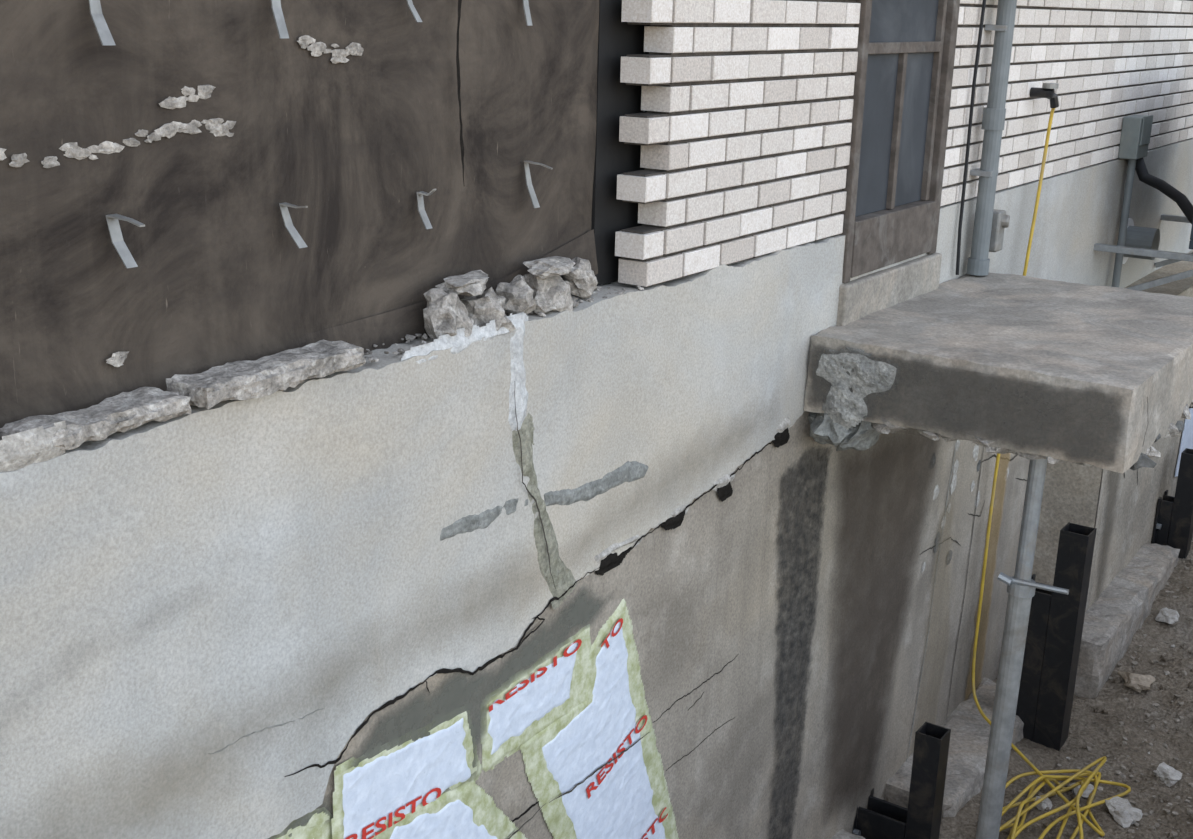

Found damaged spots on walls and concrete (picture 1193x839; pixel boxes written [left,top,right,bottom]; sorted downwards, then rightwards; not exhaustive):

spalling [0,340,366,450]
spalling [423,256,598,339]
crack [285,312,791,777]
spalling [808,347,1094,572]